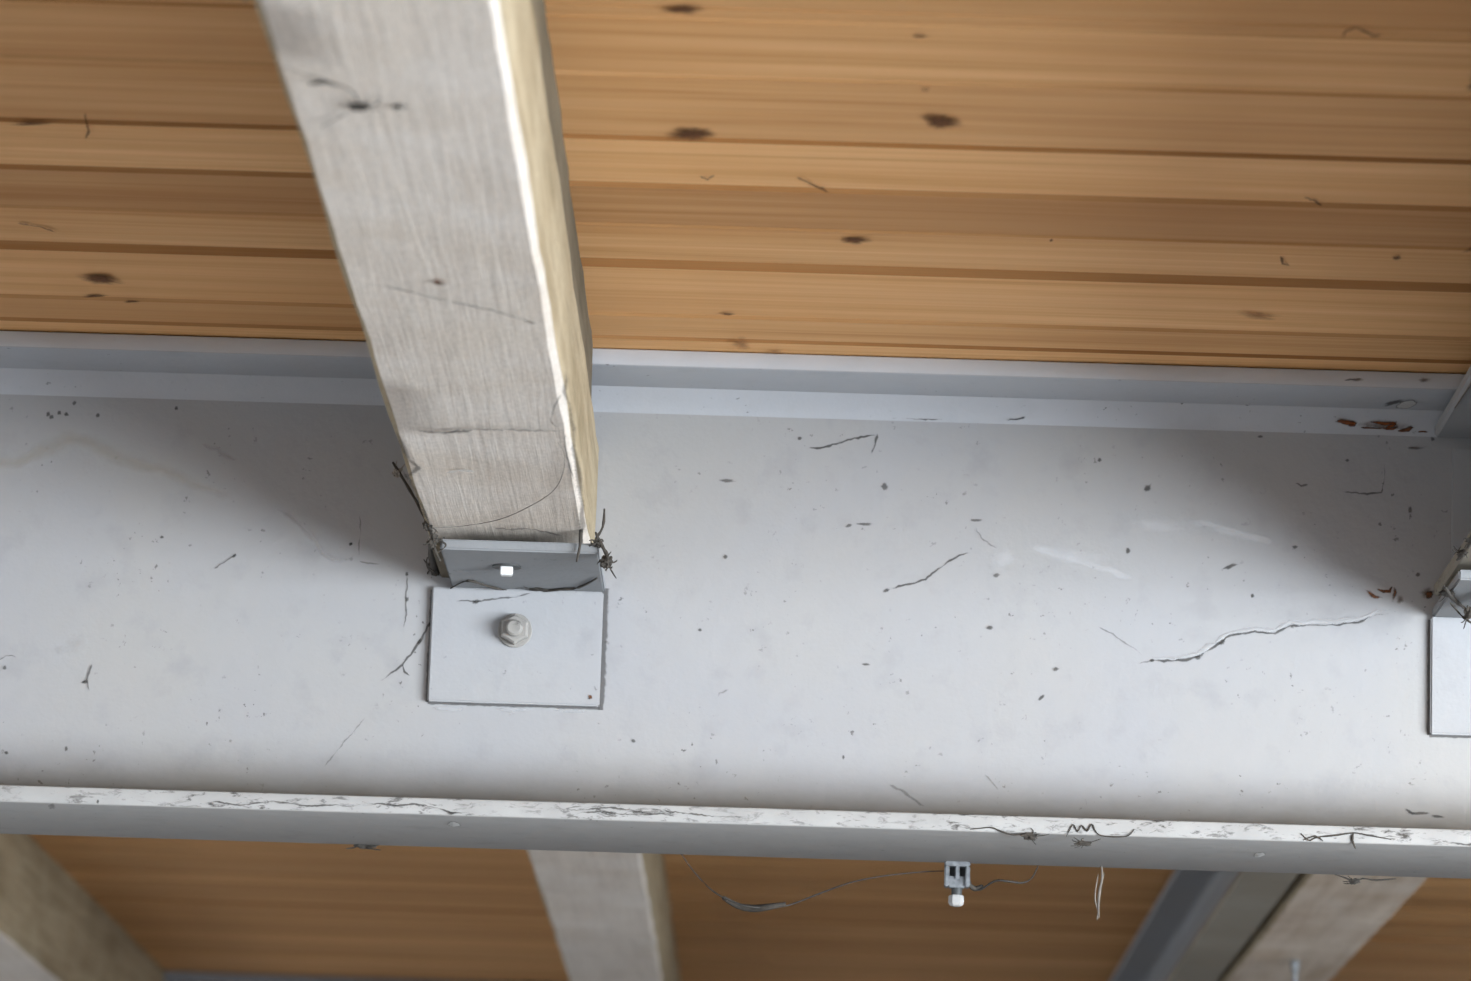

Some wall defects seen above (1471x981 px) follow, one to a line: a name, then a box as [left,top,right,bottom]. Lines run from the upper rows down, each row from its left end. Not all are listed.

crack [884,553,966,592]
crack [1151,618,1367,662]